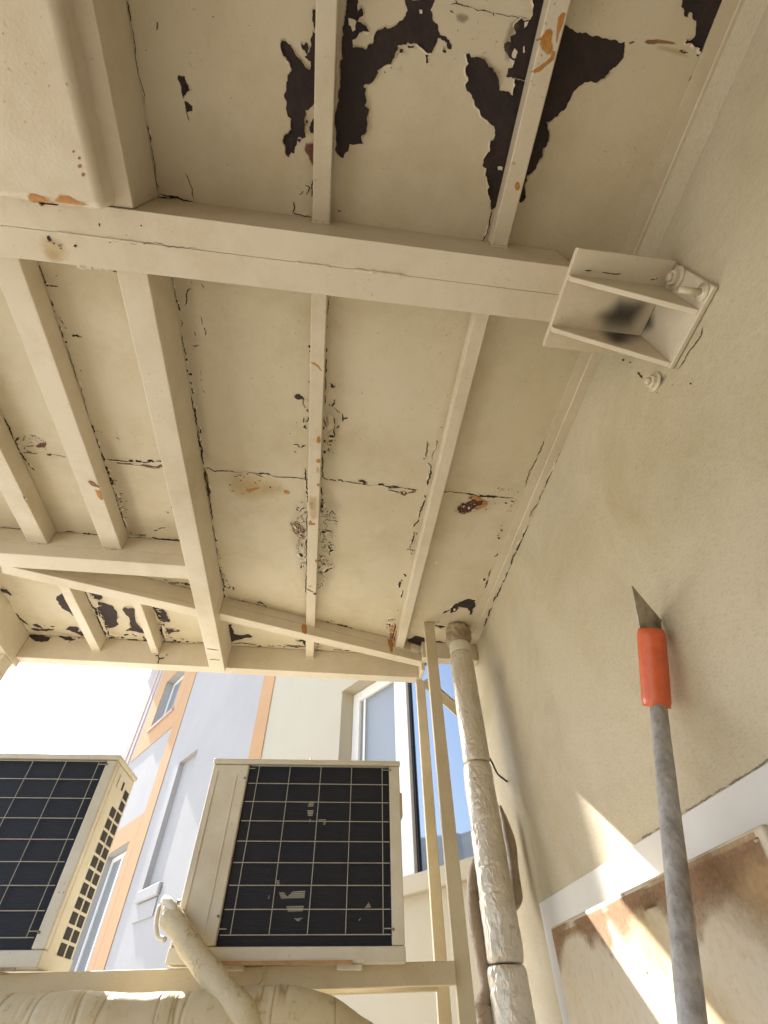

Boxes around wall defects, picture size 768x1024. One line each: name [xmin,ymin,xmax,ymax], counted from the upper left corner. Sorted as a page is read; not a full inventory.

peeling [279,7,316,158]
peeling [335,0,452,158]
peeling [463,0,544,209]
rust [533,13,565,73]
peeling [519,23,625,204]
peeling [681,0,722,55]
rust [28,194,87,205]
crack [4,418,67,470]
crack [39,265,180,541]
crack [172,279,559,639]
peeling [29,594,84,643]
peeling [88,593,144,633]